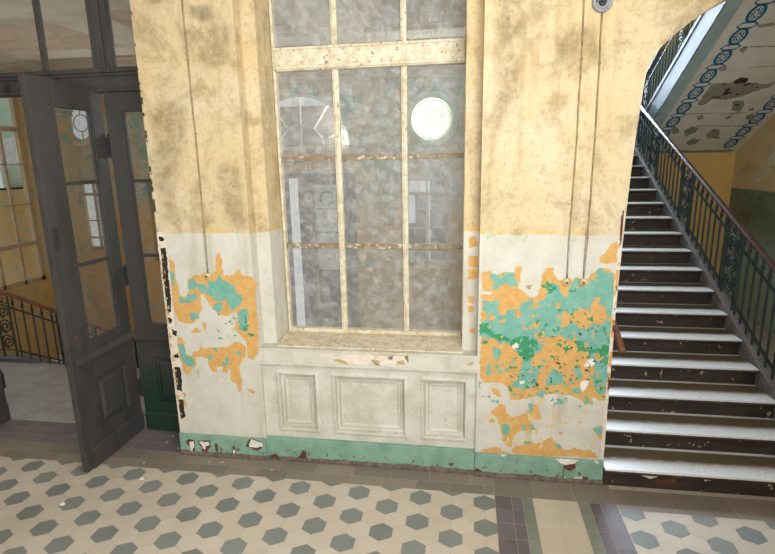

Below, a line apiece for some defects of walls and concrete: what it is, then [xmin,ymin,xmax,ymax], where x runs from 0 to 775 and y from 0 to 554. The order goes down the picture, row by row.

spalling [698,77,775,120]
spalling [670,115,720,145]
peeling [157,230,259,427]
peeling [318,351,413,366]
peeling [467,210,624,480]
peeling [186,438,328,459]